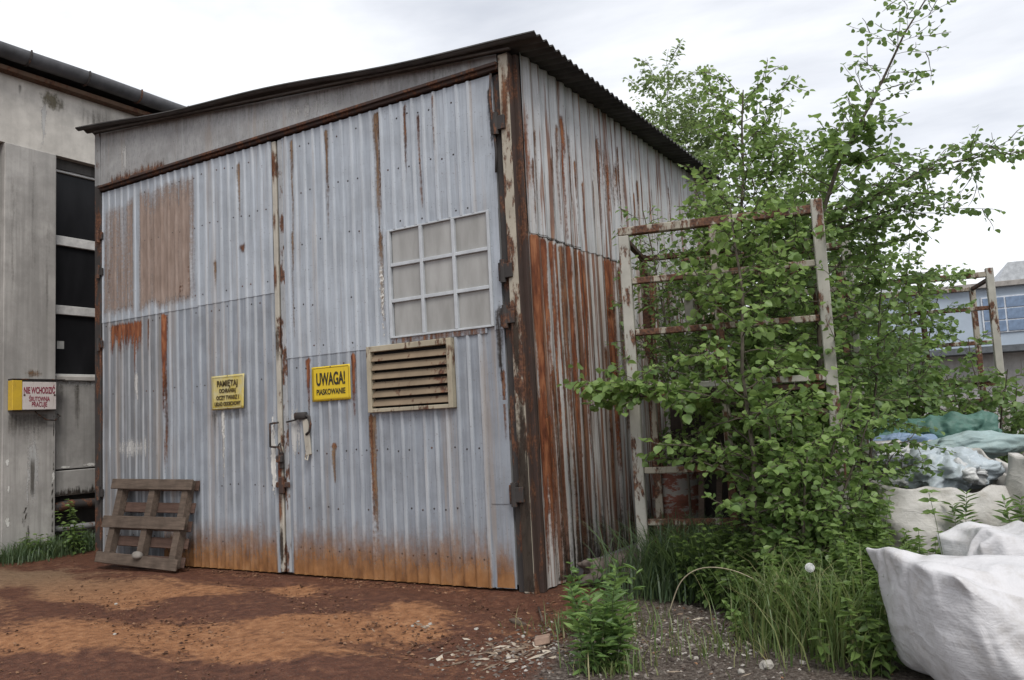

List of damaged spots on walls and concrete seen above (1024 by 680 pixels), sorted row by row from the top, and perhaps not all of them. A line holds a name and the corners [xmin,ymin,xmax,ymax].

rust [373,112,383,264]
rust [403,105,422,194]
rust [111,314,168,459]
rust [524,111,680,572]
rust [368,415,378,529]